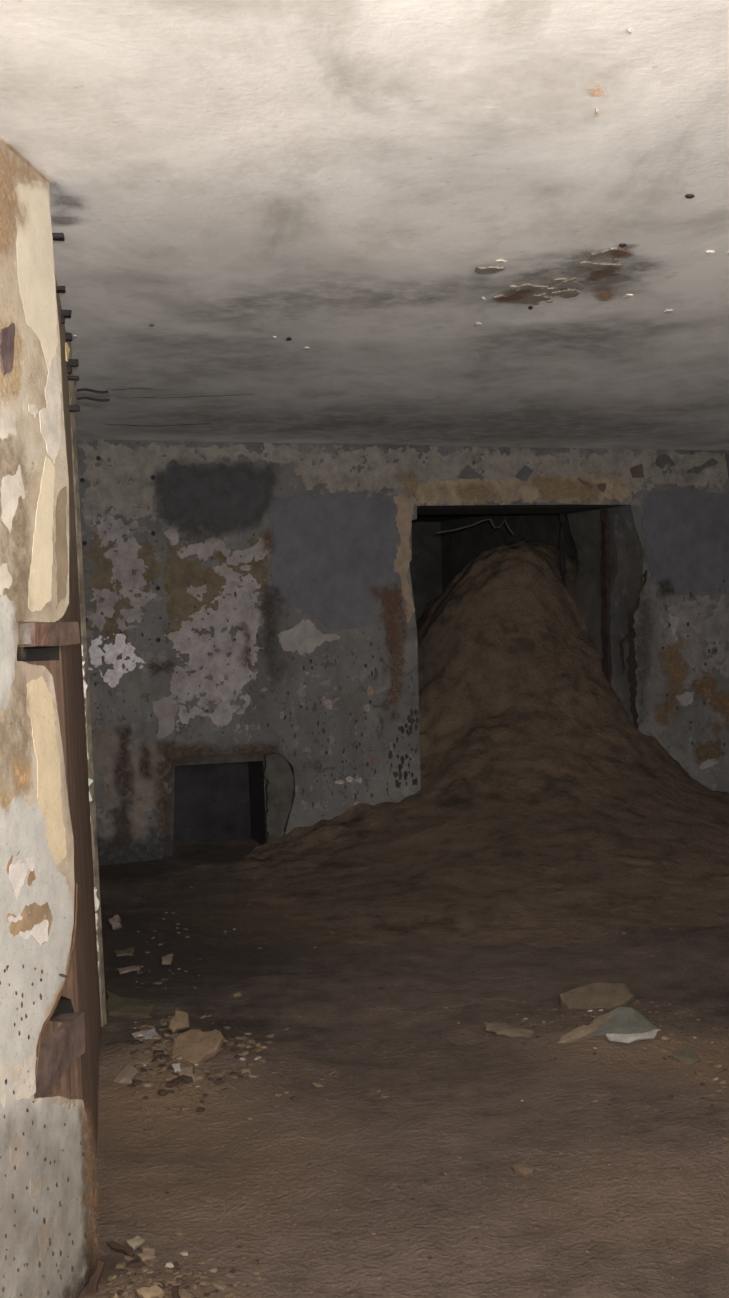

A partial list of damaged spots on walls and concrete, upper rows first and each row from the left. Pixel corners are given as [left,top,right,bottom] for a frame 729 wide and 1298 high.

corrosion [589,246,632,300]
peeling [0,179,729,865]
corrosion [373,586,406,721]
crack [619,570,647,729]
peeling [6,852,53,945]
peeling [0,964,46,1177]
spalling [2,1186,86,1298]